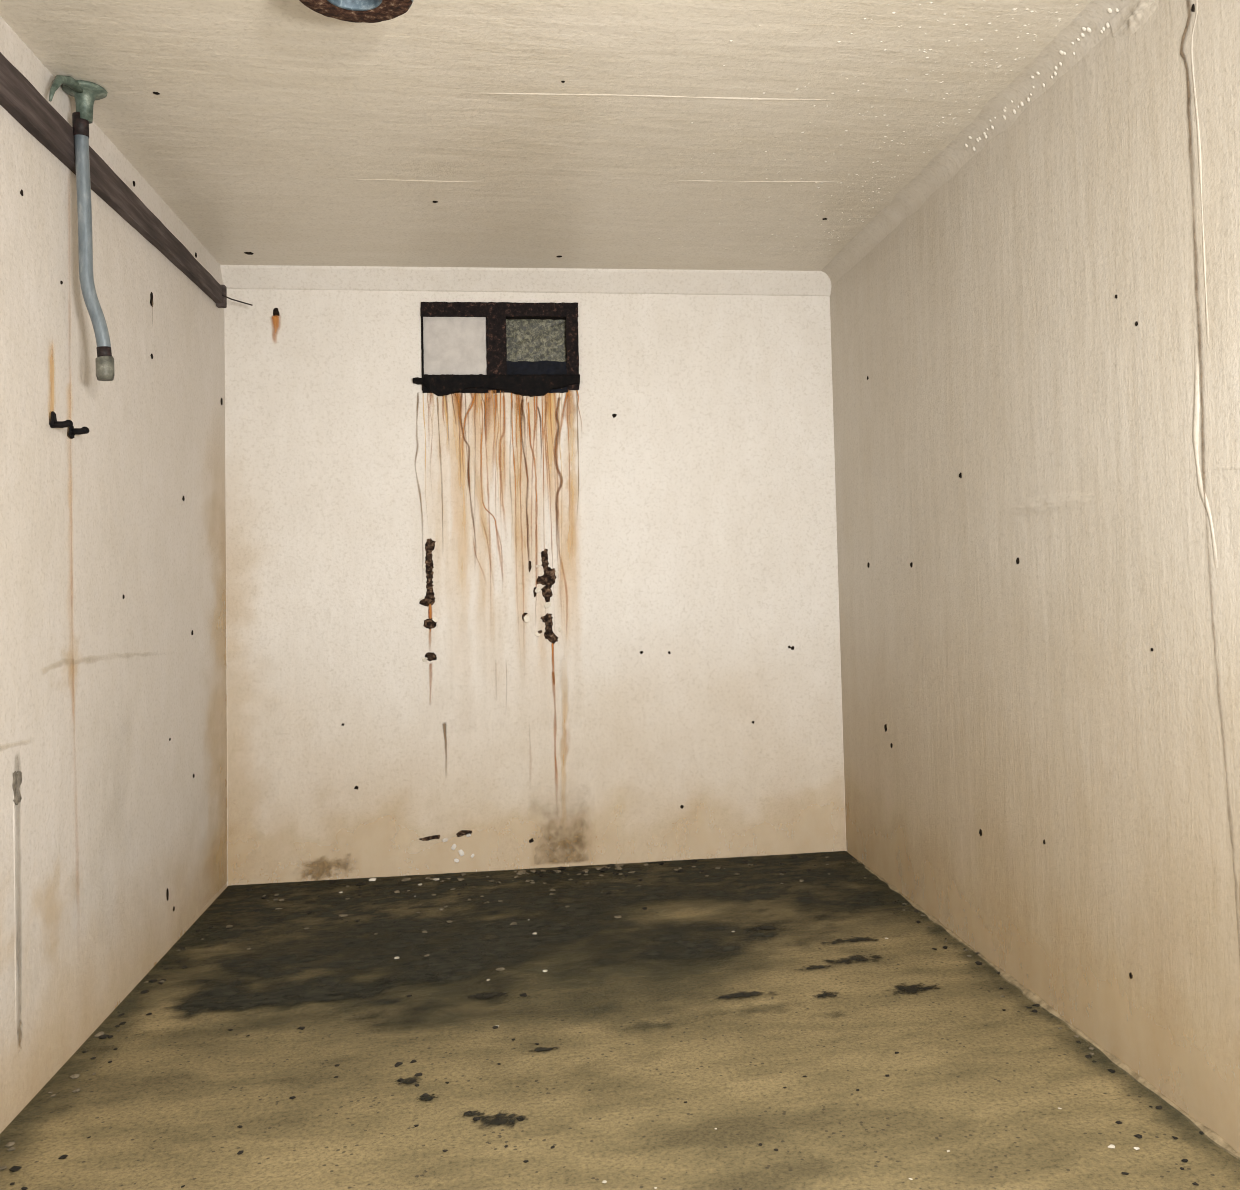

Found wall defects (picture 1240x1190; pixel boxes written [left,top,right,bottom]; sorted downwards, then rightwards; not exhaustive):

corrosion [272,308,280,337]
crack [1180,0,1218,568]
corrosion [415,390,580,547]
leakage [0,833,950,1149]
leakage [1081,1044,1216,1143]